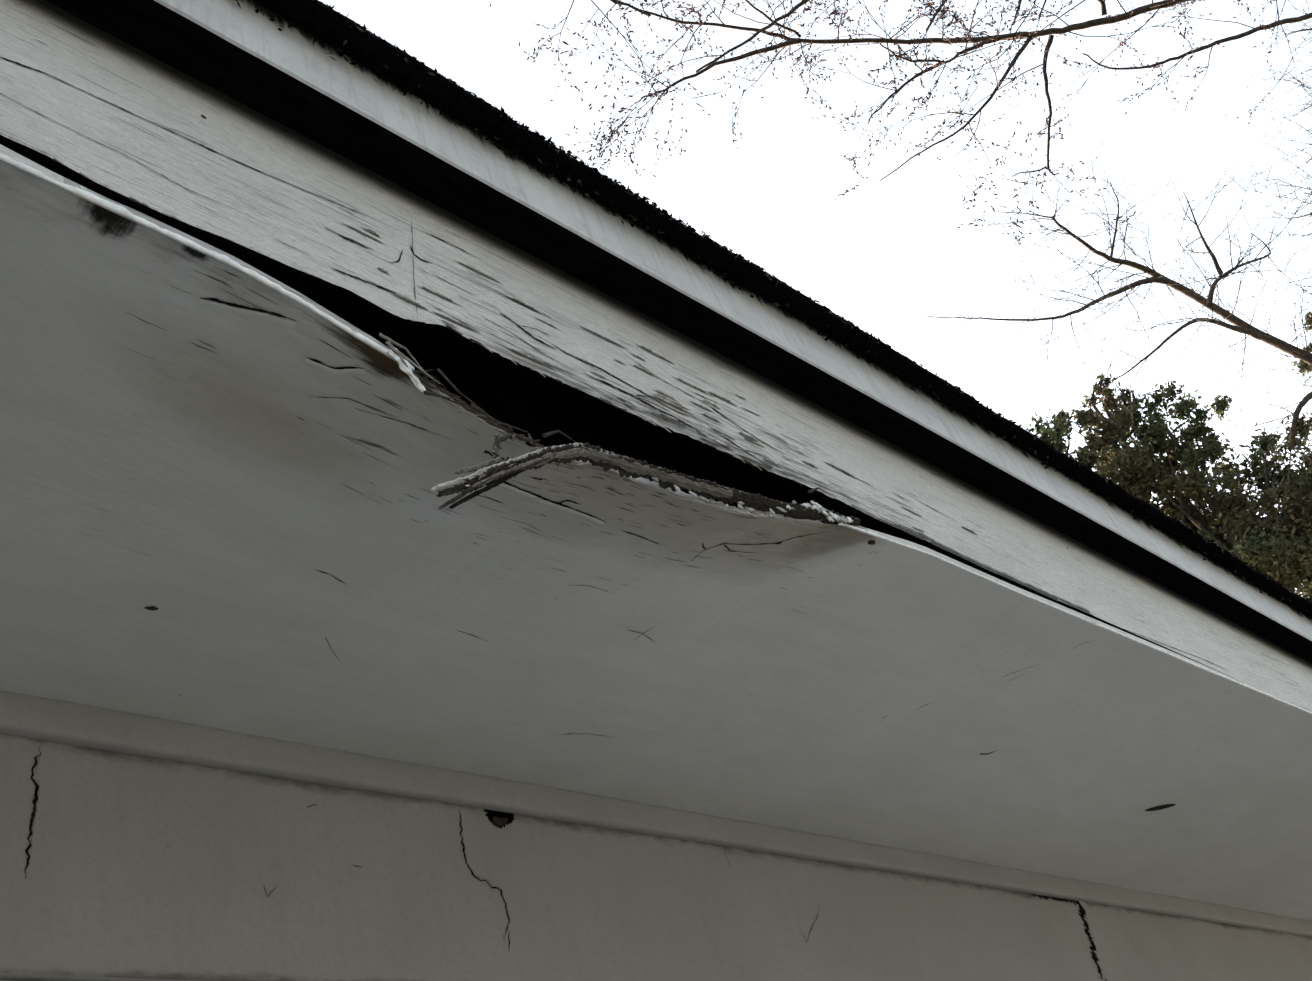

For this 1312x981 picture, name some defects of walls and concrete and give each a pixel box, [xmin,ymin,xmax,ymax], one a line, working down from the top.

peeling [385,285,924,532]
crack [24,747,47,880]
crack [459,810,513,946]
crack [1031,894,1112,981]